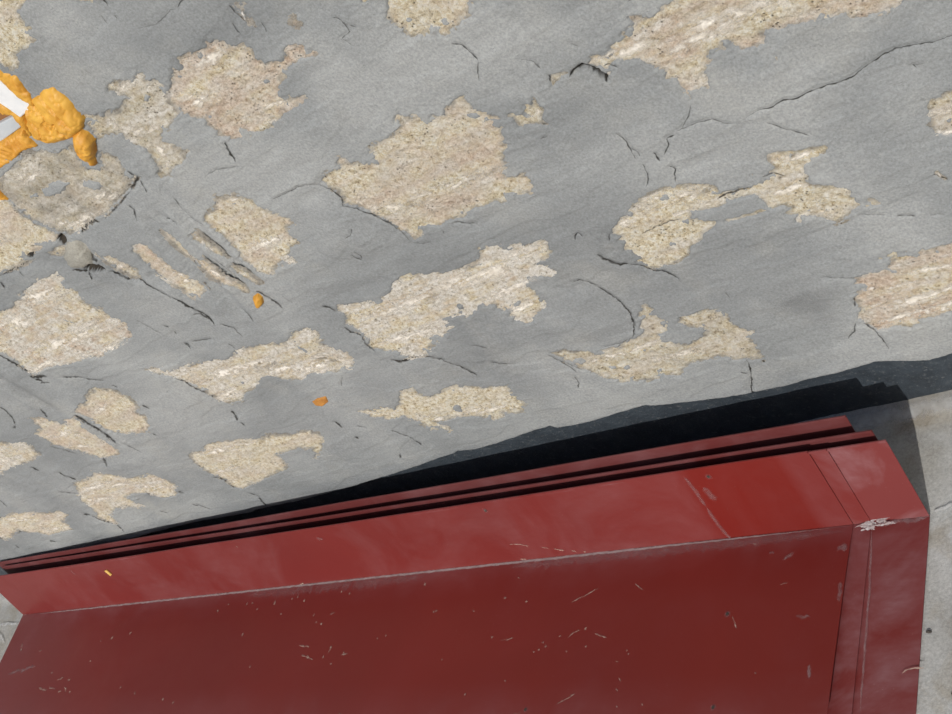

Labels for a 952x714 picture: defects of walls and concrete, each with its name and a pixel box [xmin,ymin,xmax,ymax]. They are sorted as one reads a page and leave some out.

spalling [588,0,902,99]
crack [760,35,952,135]
crack [57,171,146,244]
spalling [0,40,318,273]
spalling [322,95,549,240]
spalling [612,145,881,270]
spalling [0,271,132,376]
crack [74,247,282,349]
spalling [145,327,355,405]
spalling [337,239,557,360]
crack [574,279,635,336]
spalling [0,387,151,475]